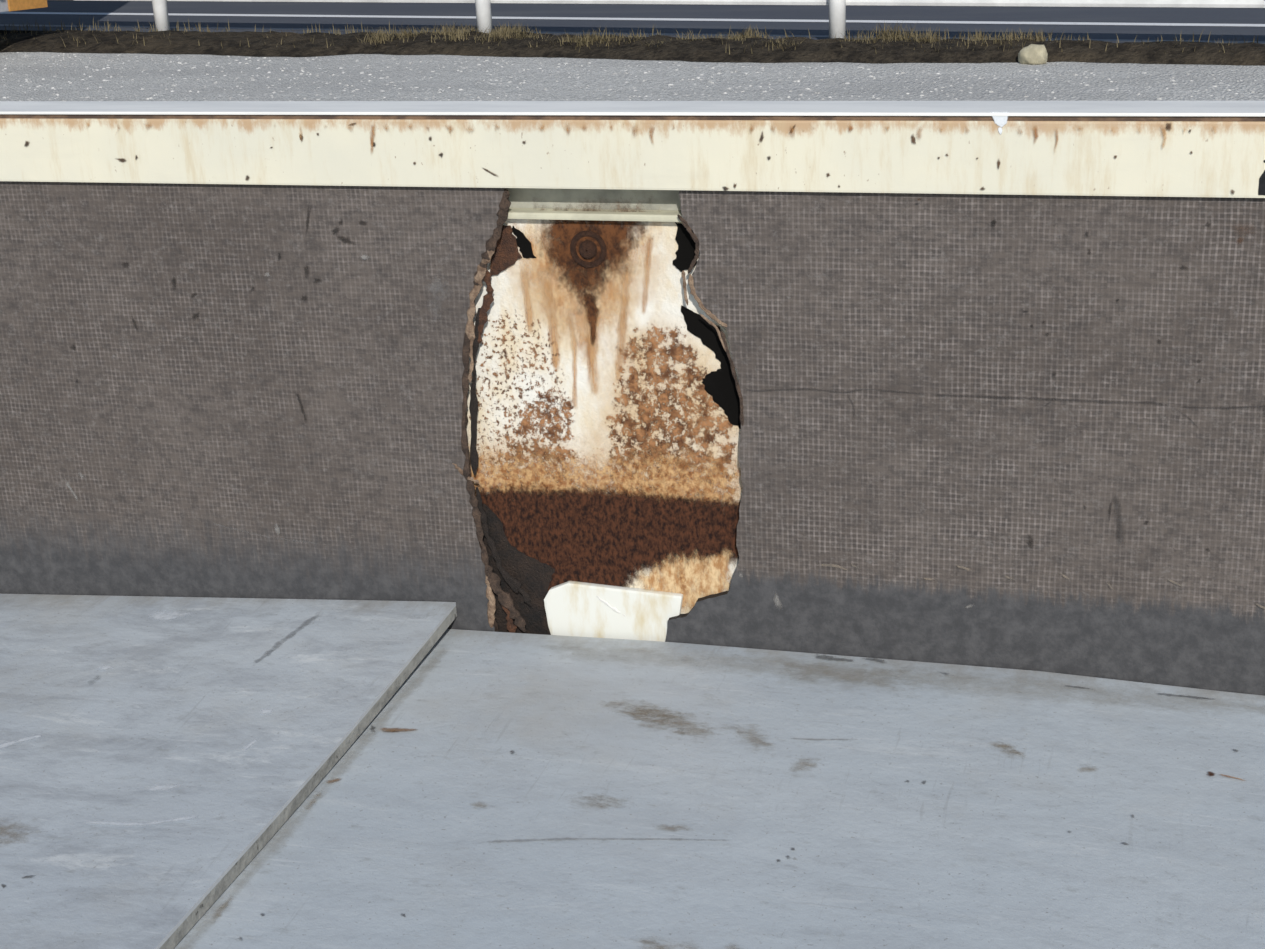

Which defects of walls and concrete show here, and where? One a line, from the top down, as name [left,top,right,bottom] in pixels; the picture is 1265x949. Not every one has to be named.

rust [467,207,740,608]
peeling [677,215,744,426]